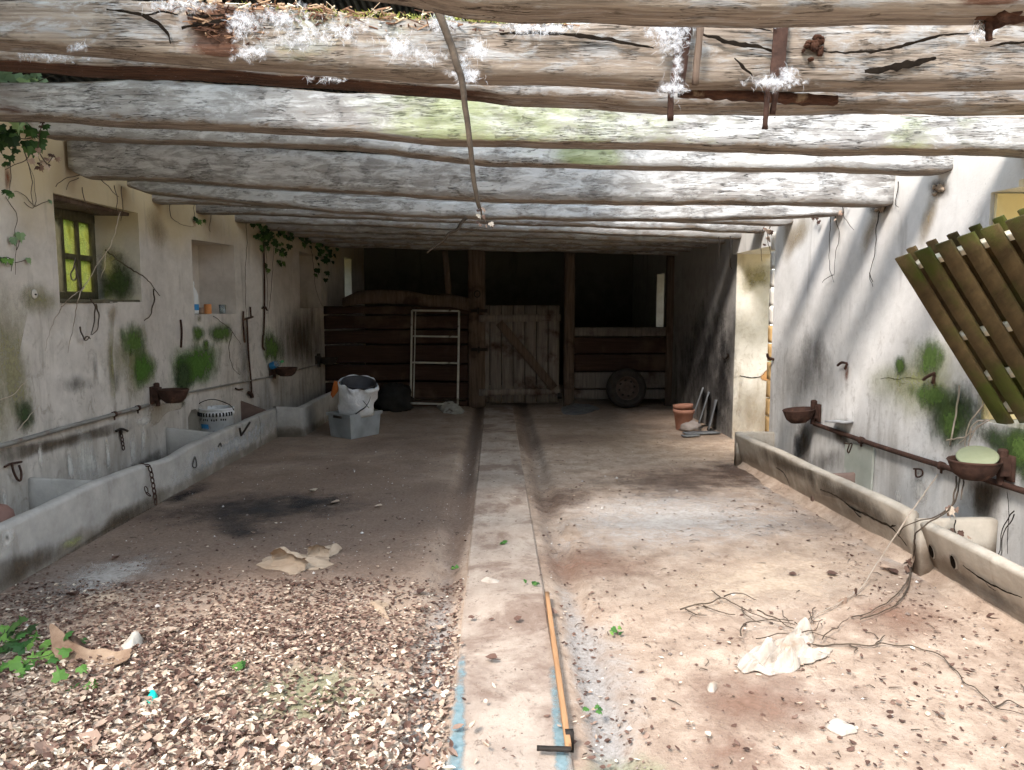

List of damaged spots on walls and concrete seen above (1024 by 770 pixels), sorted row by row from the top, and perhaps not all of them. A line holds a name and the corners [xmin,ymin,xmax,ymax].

crack [703,28,772,76]
crack [823,33,1024,74]
damp [175,361,191,388]
crack [820,489,907,546]
crack [963,565,1022,598]